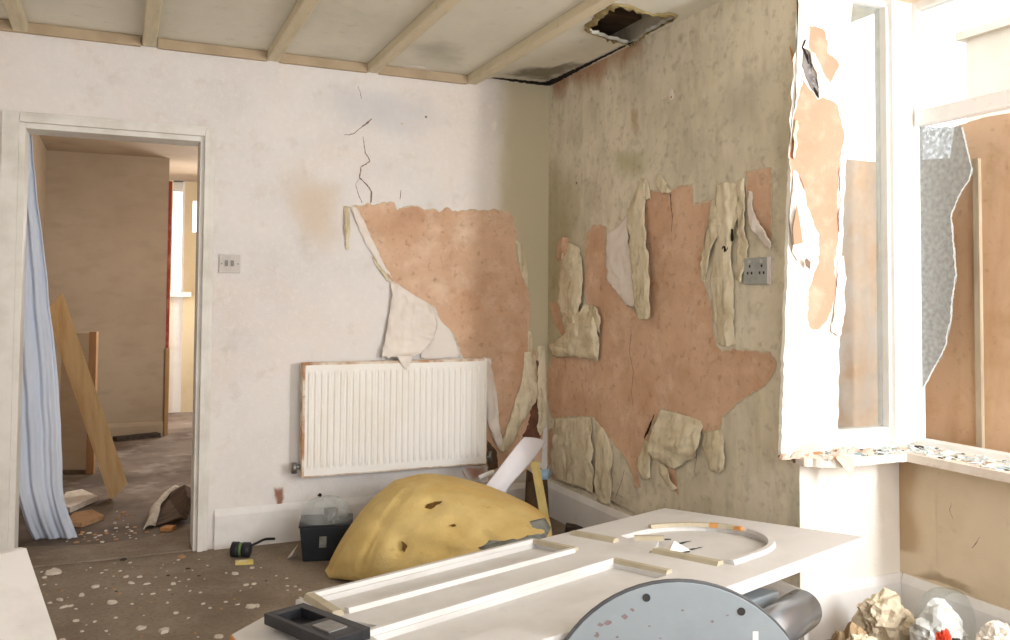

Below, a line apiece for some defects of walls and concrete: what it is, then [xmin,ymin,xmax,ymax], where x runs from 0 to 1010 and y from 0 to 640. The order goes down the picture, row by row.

crack [345,87,372,203]
flaking render [746,168,772,242]
flaking render [788,25,847,337]
flaking render [354,185,777,488]
flaking render [660,463,679,496]